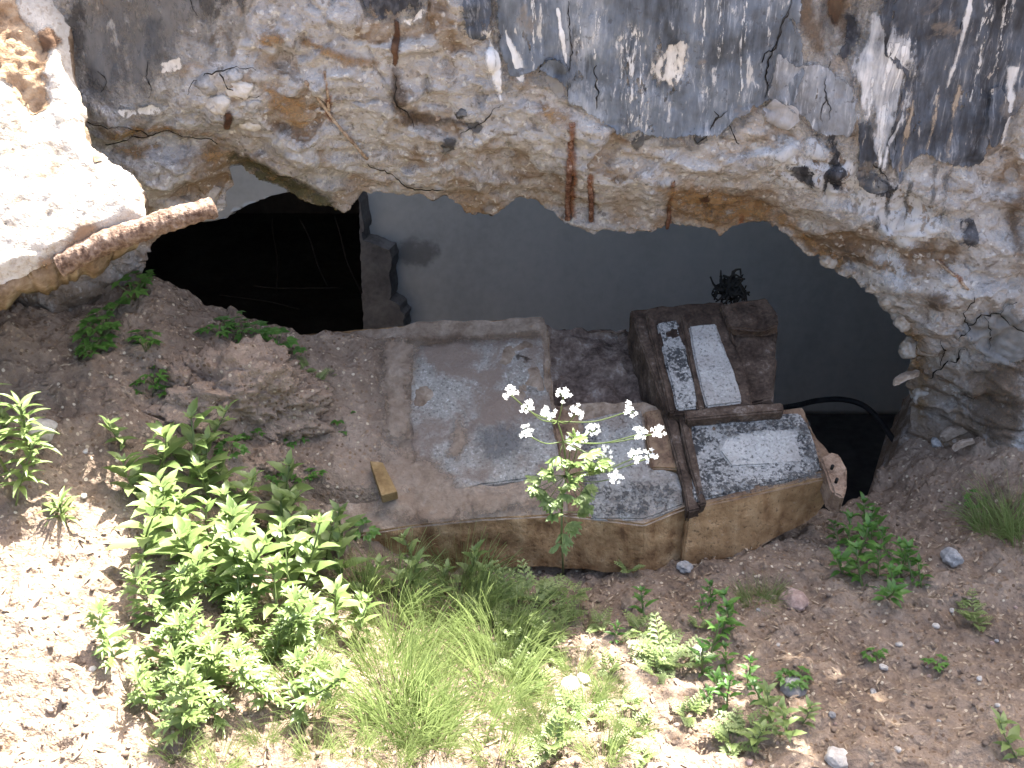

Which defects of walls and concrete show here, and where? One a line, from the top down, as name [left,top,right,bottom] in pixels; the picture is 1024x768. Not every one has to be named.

crack [87,121,217,145]
crack [188,66,260,99]
rust [391,19,407,110]
crack [393,75,414,127]
crack [368,164,444,191]
rust [539,104,595,217]
spalling [564,141,574,221]
peeling [462,0,1024,194]
crack [762,0,792,106]
rust [660,182,842,265]
crack [929,297,1024,379]